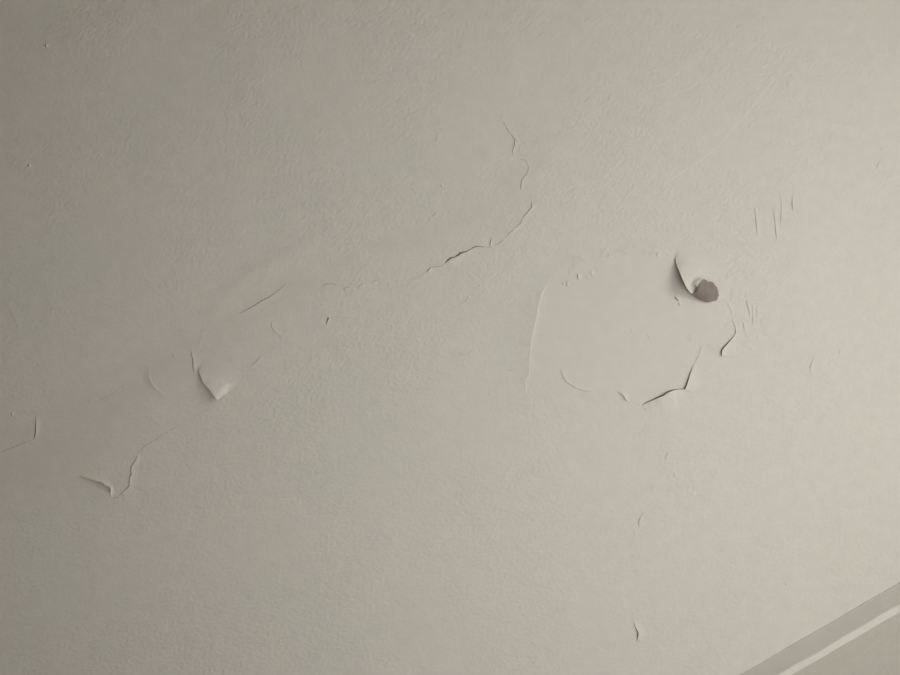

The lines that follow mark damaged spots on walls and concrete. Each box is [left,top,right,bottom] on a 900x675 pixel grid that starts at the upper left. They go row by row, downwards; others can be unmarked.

crack [408,112,537,285]
peeling [191,284,290,400]
peeling [484,240,746,425]